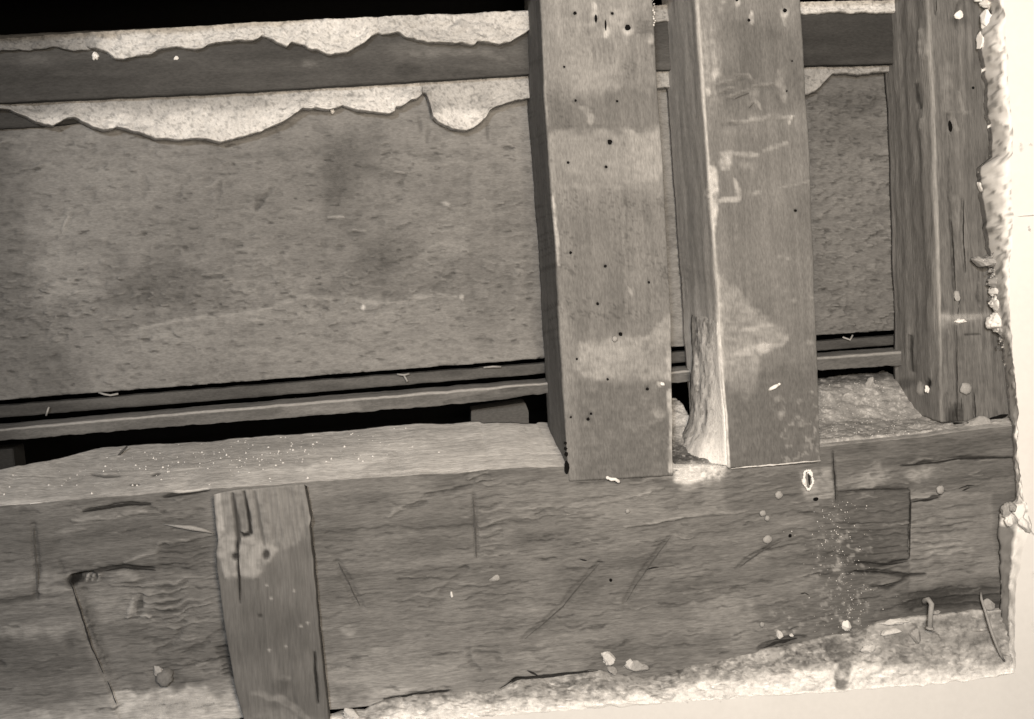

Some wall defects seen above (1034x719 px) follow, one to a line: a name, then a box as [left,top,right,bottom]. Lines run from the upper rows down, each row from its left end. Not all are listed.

spalling [974,0,992,49]